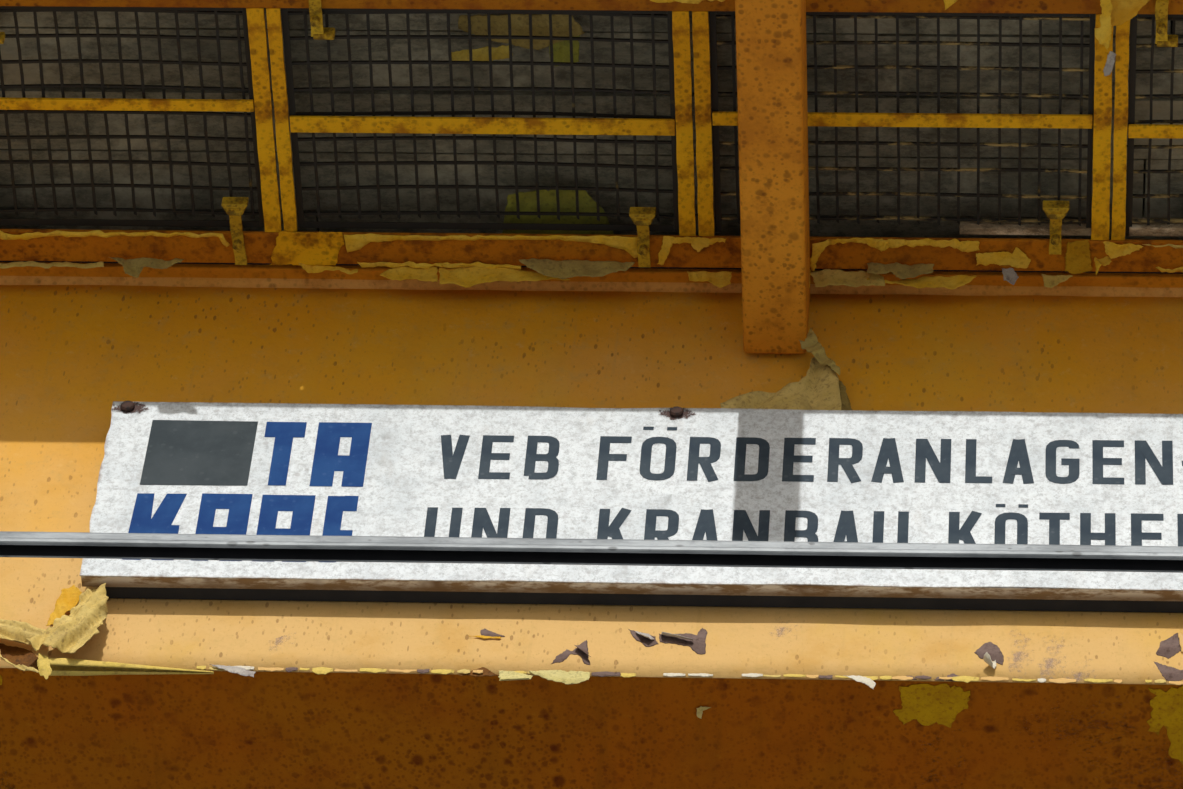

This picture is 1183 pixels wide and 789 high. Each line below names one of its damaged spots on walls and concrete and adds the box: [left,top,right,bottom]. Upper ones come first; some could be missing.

peeling [1094,0,1149,76]
peeling [0,257,184,278]
peeling [298,263,358,275]
peeling [380,258,635,288]
peeling [809,262,976,290]
peeling [1002,268,1019,285]
peeling [1042,274,1073,288]
peeling [720,328,852,410]
peeling [0,583,636,684]
peeling [629,628,707,655]
peeling [742,642,1122,690]
peeling [1145,632,1183,685]